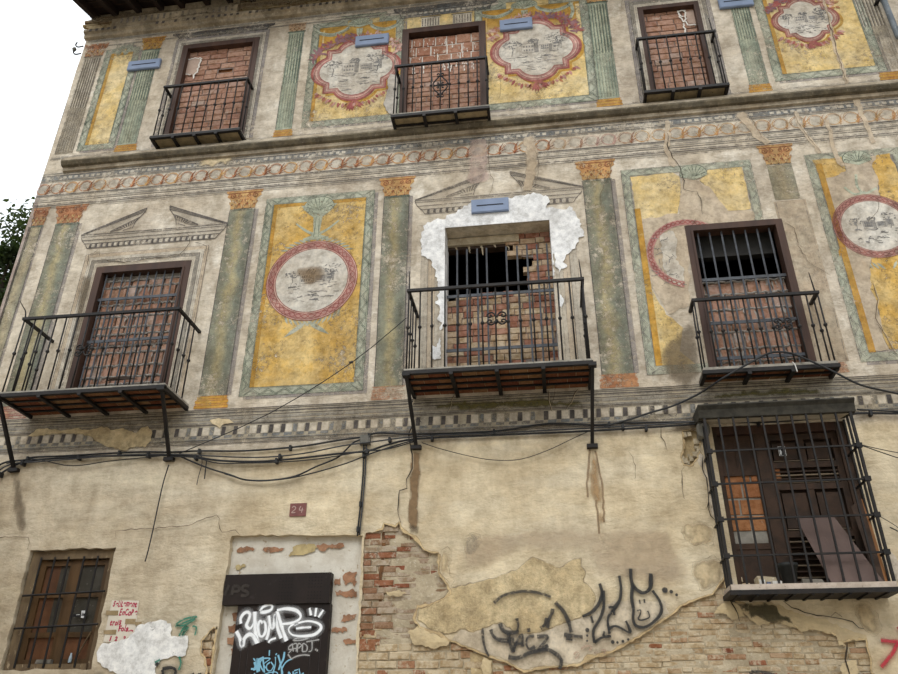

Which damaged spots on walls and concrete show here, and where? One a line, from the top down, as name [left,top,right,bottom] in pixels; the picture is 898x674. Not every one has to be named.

crack [667,133,702,204]
peeling [433,338,441,360]
peeling [29,426,152,451]
water stain [15,482,24,527]
crack [115,515,240,535]
rust [408,452,420,531]
rust [586,450,605,534]
peeling [237,543,344,556]
flaking render [331,521,874,674]